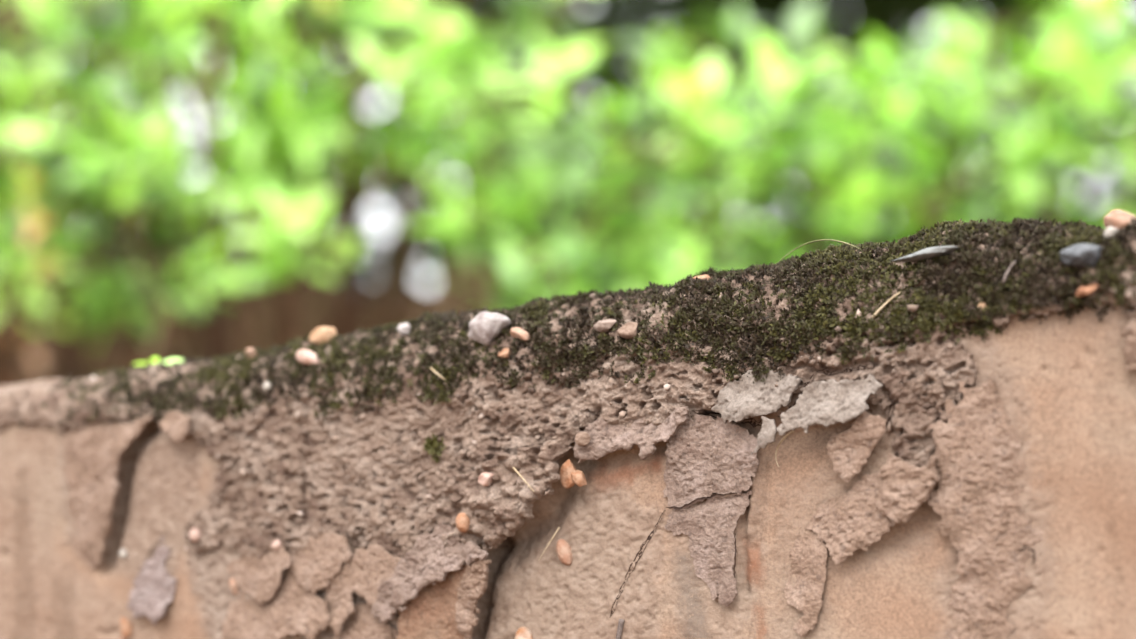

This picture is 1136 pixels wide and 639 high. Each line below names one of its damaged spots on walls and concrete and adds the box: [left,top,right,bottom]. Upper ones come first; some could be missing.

flaking render [1120,308,1136,372]
flaking render [222,522,491,639]
crack [609,492,743,618]
flaking render [560,368,1045,639]